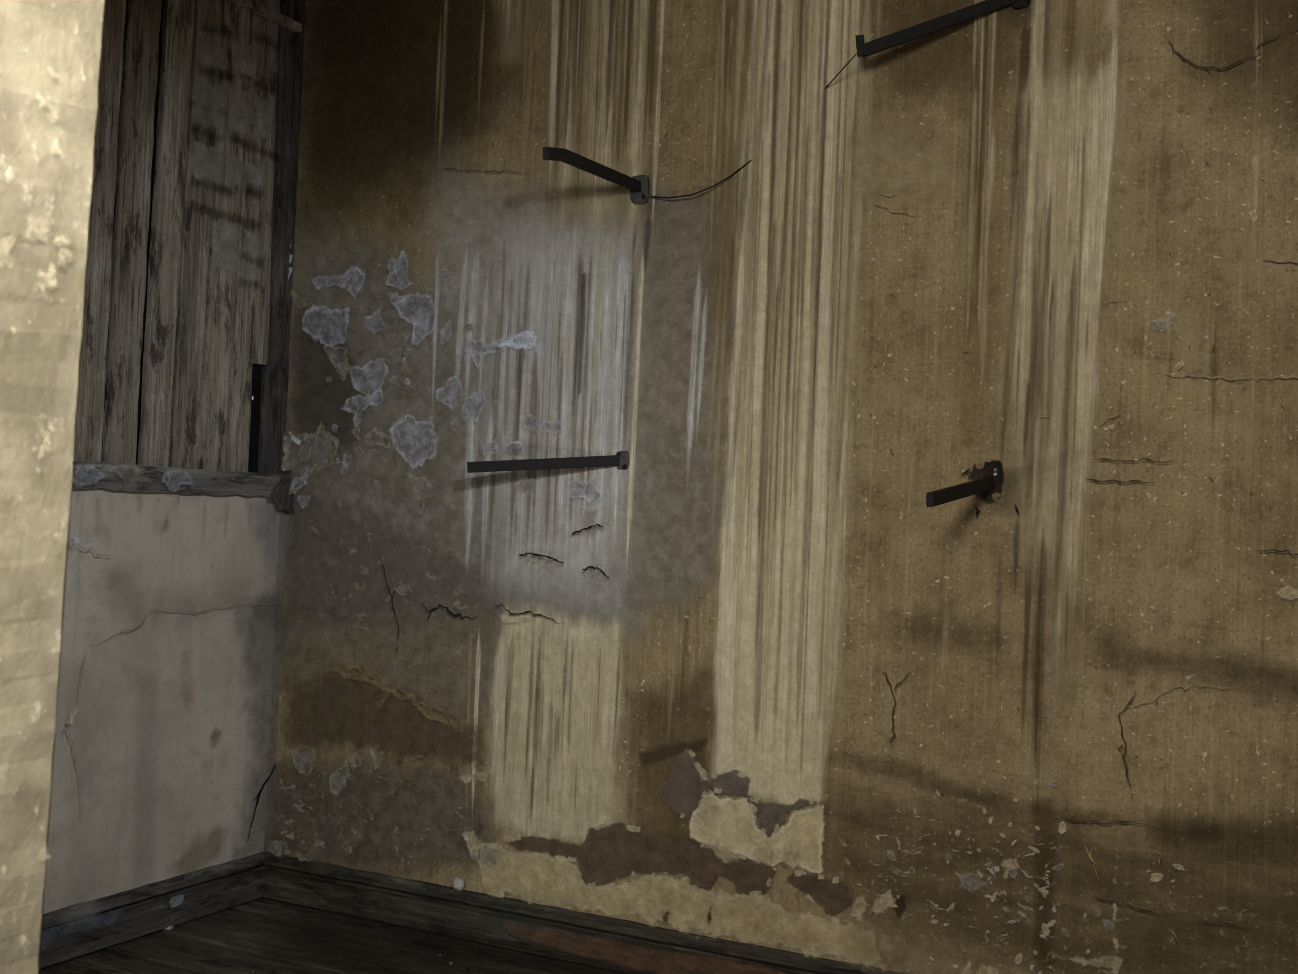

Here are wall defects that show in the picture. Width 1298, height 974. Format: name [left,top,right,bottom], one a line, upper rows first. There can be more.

water stain [970,0,995,214]
peeling [271,246,537,514]
water stain [237,0,880,873]
water stain [1012,0,1118,694]
crack [380,555,559,659]
crack [247,765,276,842]
flaking render [452,877,465,891]
flaking render [463,749,1067,974]
crack [882,672,909,747]
peeling [1075,904,1121,974]
water stain [925,841,1298,969]
crack [1050,683,1234,864]